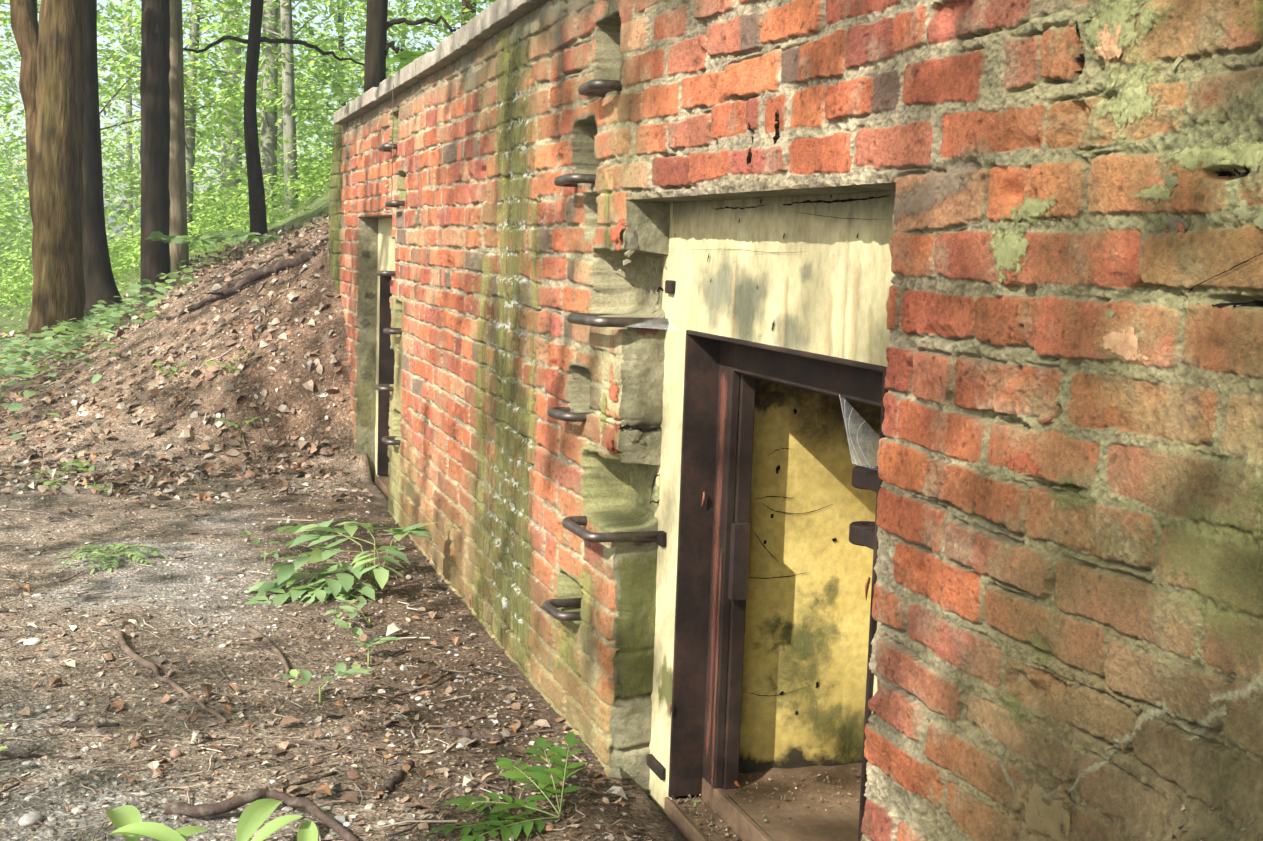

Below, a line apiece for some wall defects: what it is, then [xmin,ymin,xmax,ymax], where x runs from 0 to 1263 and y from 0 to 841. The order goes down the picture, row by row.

crack [715,195,889,220]
damp [705,264,762,338]
crack [692,247,795,255]
crack [1181,253,1263,308]
damp [474,0,572,674]
damp [778,317,796,348]
damp [755,378,881,449]
damp [739,713,864,773]